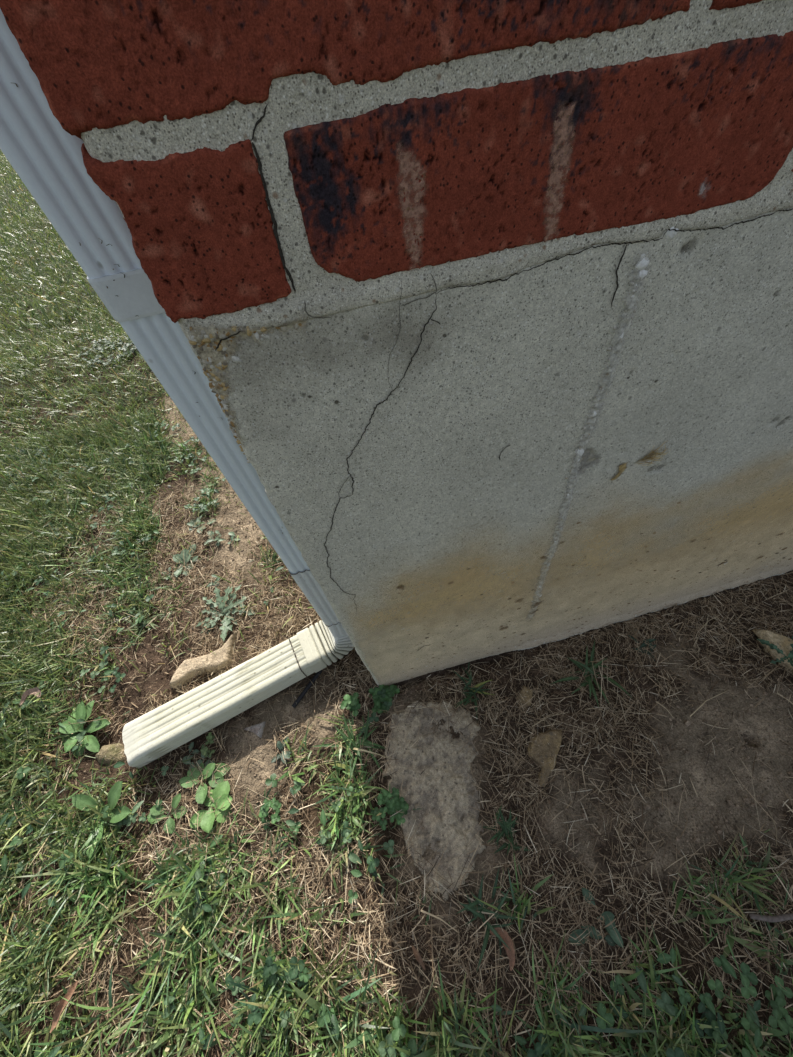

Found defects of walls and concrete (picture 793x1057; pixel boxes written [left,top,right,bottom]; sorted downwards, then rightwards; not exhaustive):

crack [324,209,793,614]